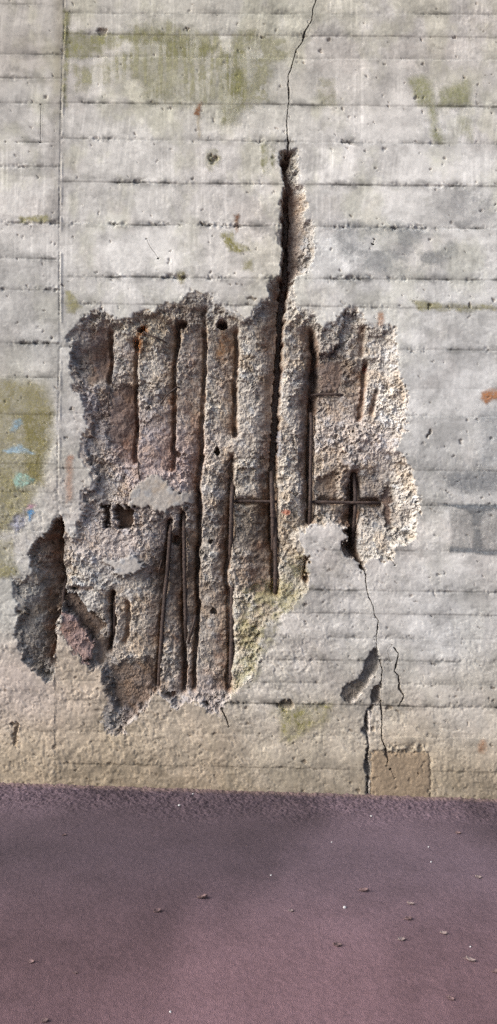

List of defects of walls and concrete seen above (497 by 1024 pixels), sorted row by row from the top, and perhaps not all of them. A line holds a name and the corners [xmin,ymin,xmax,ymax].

crack [268,0,318,478]
spalling [12,149,423,737]
rust [482,391,497,403]
spalling [341,648,382,794]
crack [362,570,407,779]